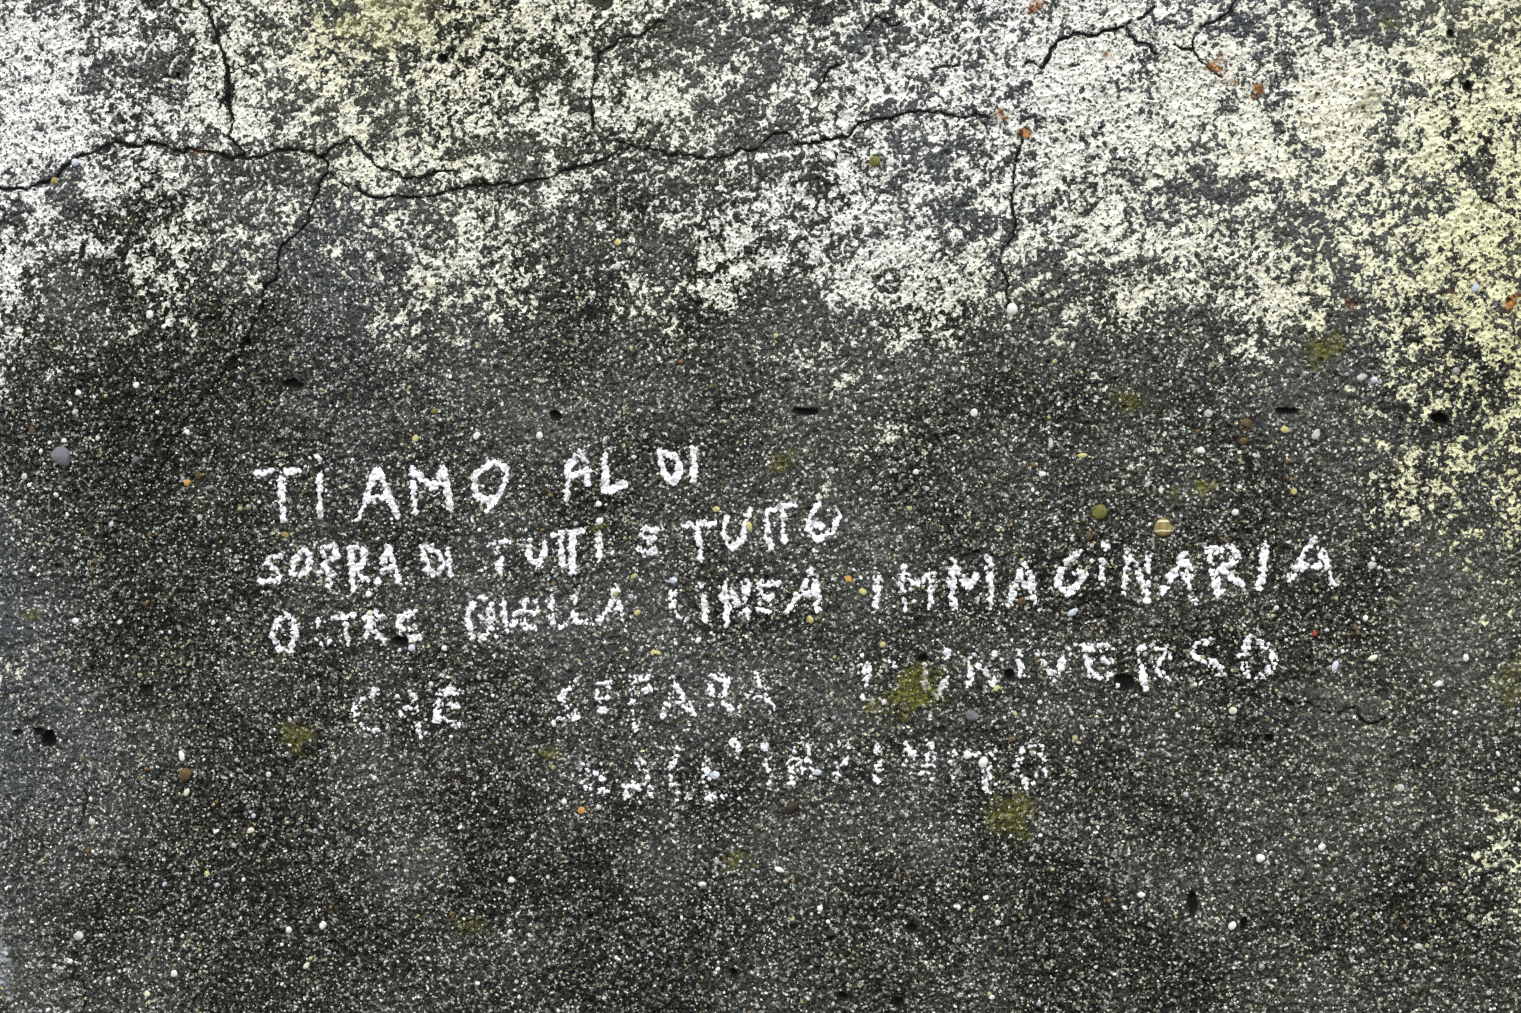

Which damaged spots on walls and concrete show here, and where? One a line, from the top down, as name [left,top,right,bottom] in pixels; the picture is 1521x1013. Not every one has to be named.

crack [0,0,1024,512]
crack [1025,0,1237,77]